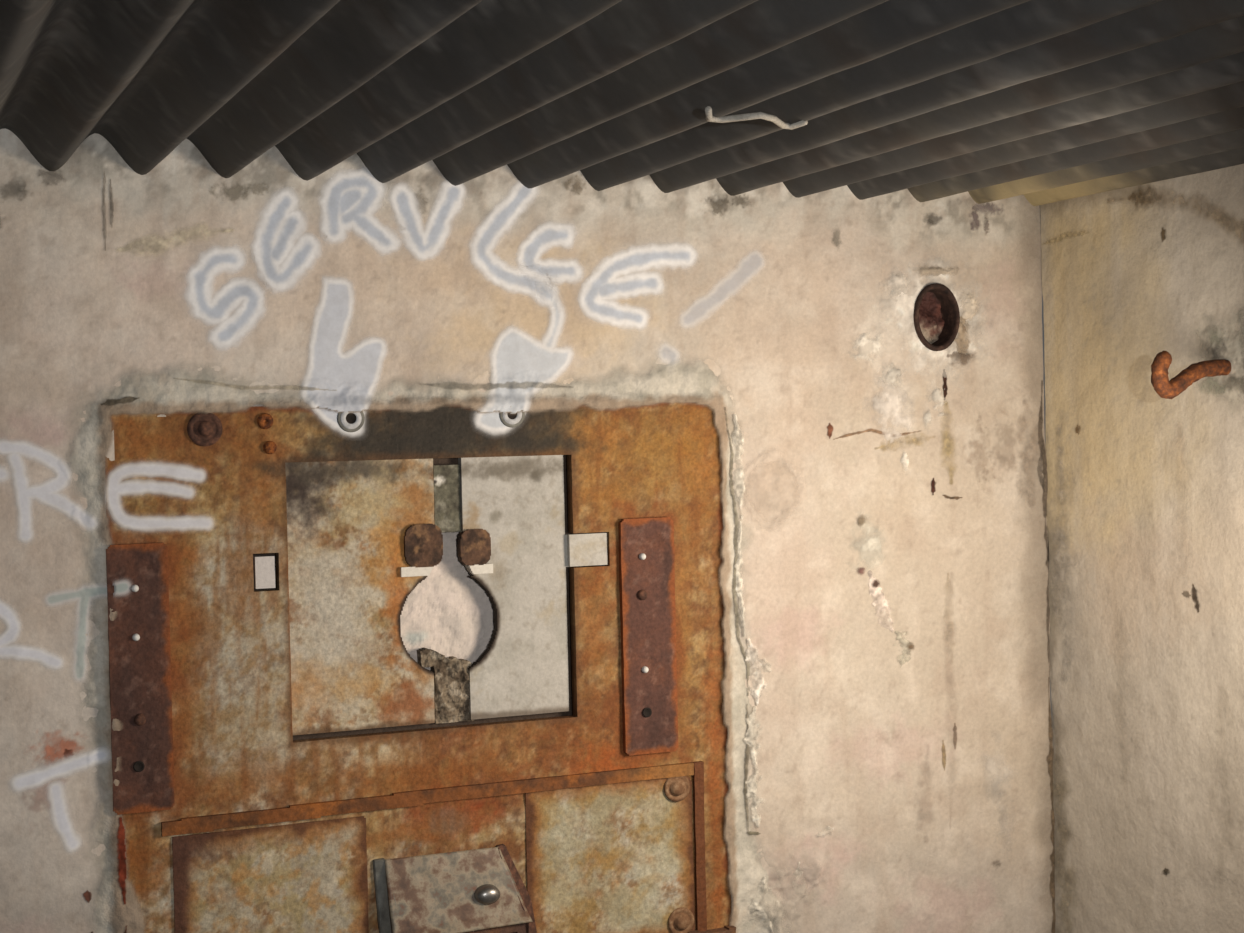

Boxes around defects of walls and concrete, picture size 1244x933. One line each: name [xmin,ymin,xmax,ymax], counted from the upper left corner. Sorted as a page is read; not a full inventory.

crack [725,407,761,835]
crack [83,817,127,933]